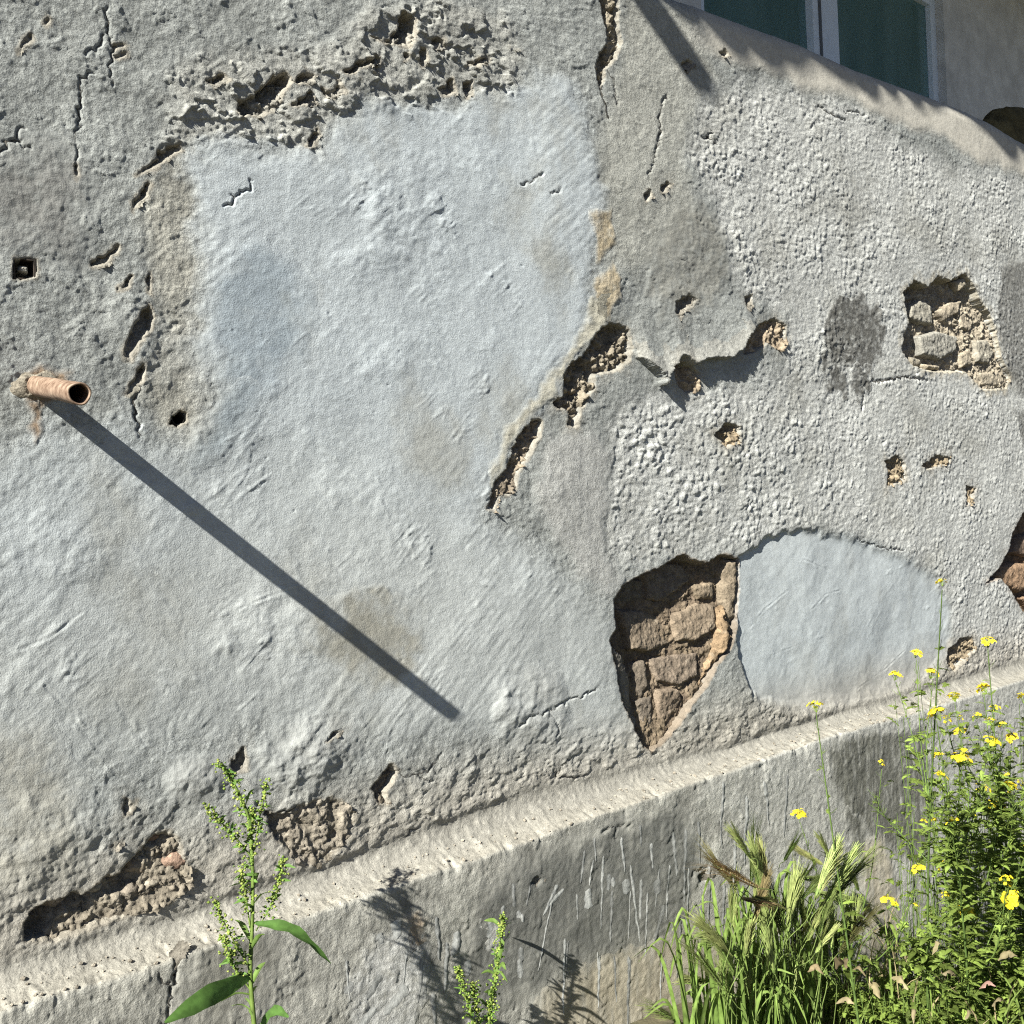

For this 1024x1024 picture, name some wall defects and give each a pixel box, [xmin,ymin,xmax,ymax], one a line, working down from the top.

crack [74,7,115,168]
spalling [237,58,379,121]
crack [595,0,618,118]
flaking render [553,296,789,425]
leakage [821,349,874,408]
spalling [902,278,1011,389]
spalling [488,421,538,514]
spalling [885,457,906,487]
spalling [991,513,1024,612]
spalling [609,557,737,749]
spalling [23,834,194,939]
spalling [265,798,356,870]